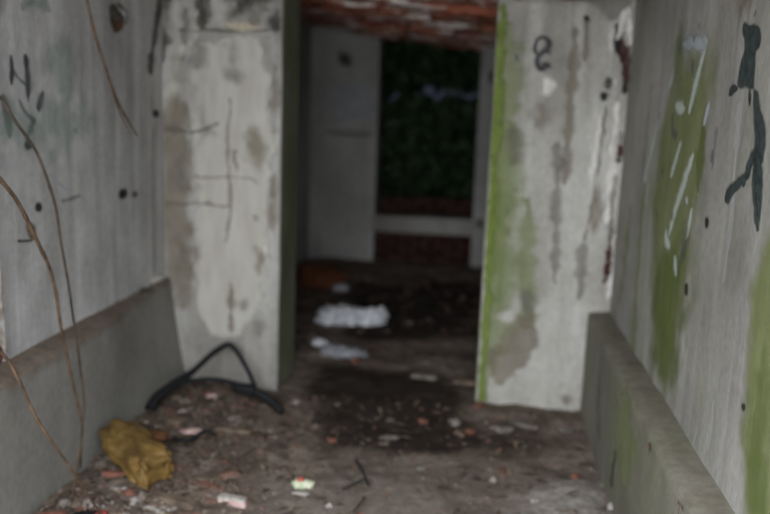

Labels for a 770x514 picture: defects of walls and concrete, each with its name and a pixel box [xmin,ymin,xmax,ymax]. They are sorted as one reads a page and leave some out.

damp [195,0,210,29]
damp [234,0,267,14]
damp [563,28,578,185]
damp [697,127,705,192]